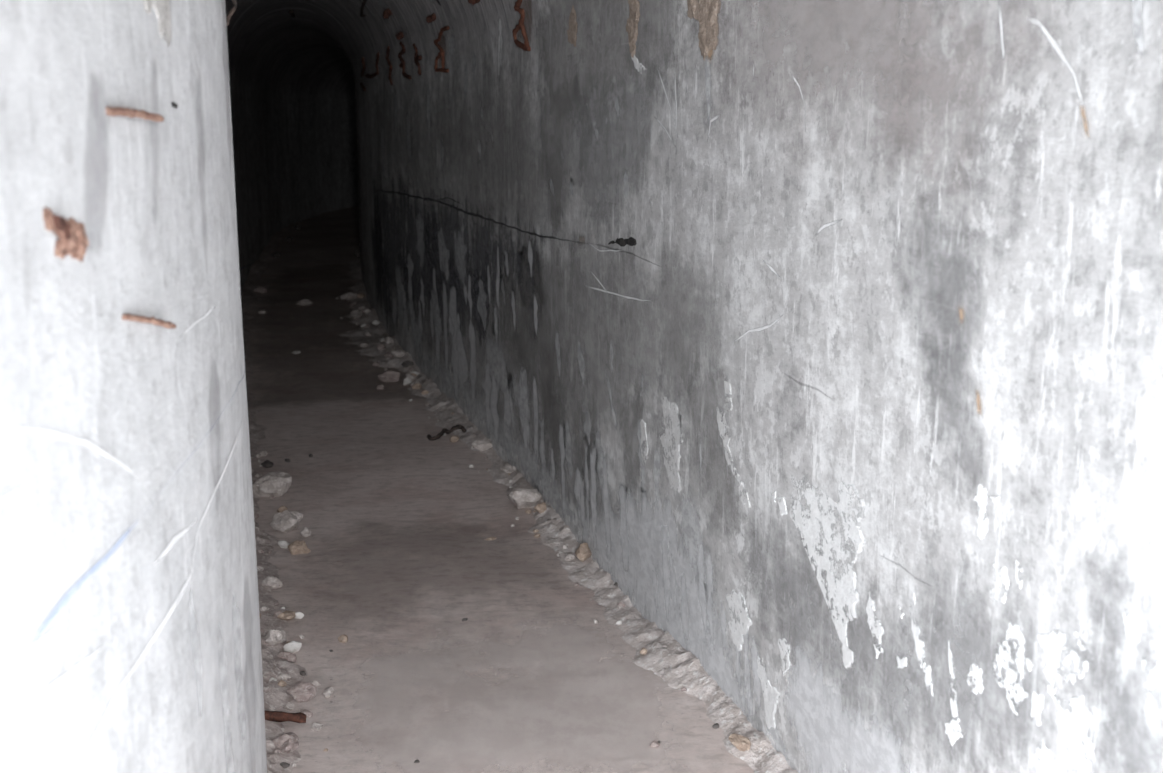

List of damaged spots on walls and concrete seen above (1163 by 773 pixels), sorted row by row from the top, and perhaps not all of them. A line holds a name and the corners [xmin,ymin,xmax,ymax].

spalling [687,0,721,60]
crack [379,190,562,240]
water stain [371,179,761,714]
peeling [974,483,1000,539]
peeling [771,476,934,697]
peeling [990,560,1023,604]
peeling [945,622,1094,773]